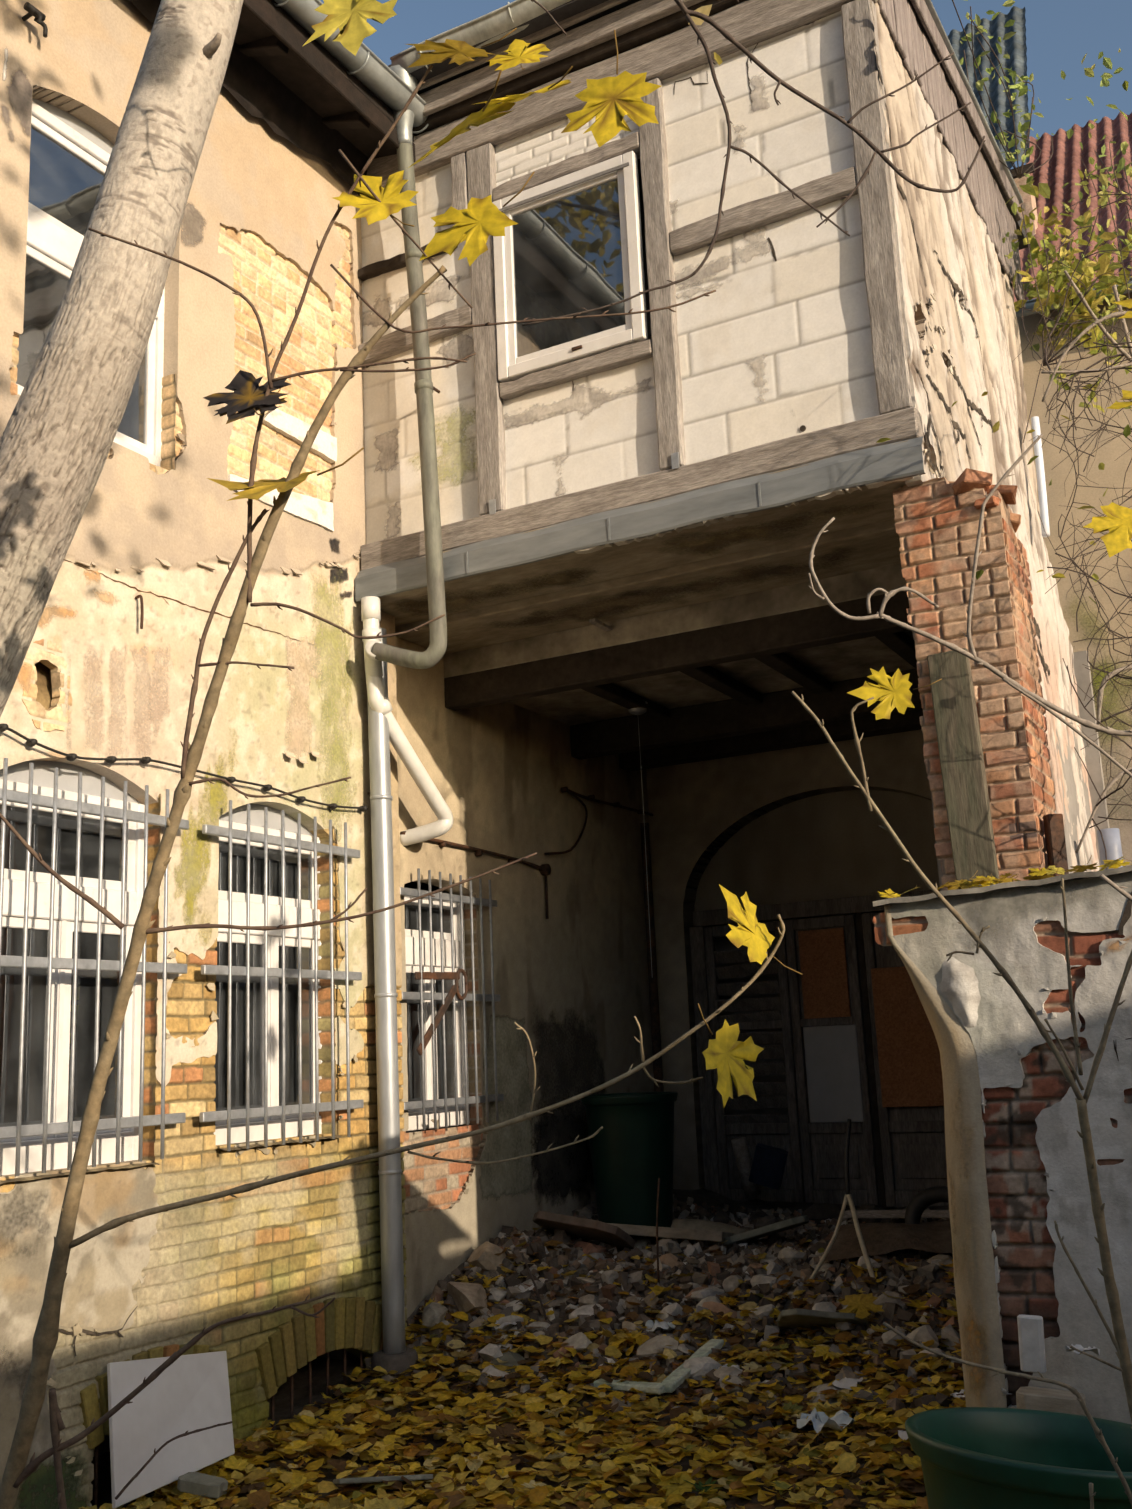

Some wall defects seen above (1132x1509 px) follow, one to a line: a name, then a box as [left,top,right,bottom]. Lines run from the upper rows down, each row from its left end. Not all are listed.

flaking render [150,403,185,475]
flaking render [218,224,354,502]
crack [870,3,993,478]
flaking render [22,639,72,731]
damp [313,583,355,841]
damp [175,767,227,925]
flaking render [310,826,345,969]
flaking render [47,938,382,1507]
flaking render [396,985,484,1331]
damp [479,1011,605,1202]
flaking render [980,917,1127,1408]